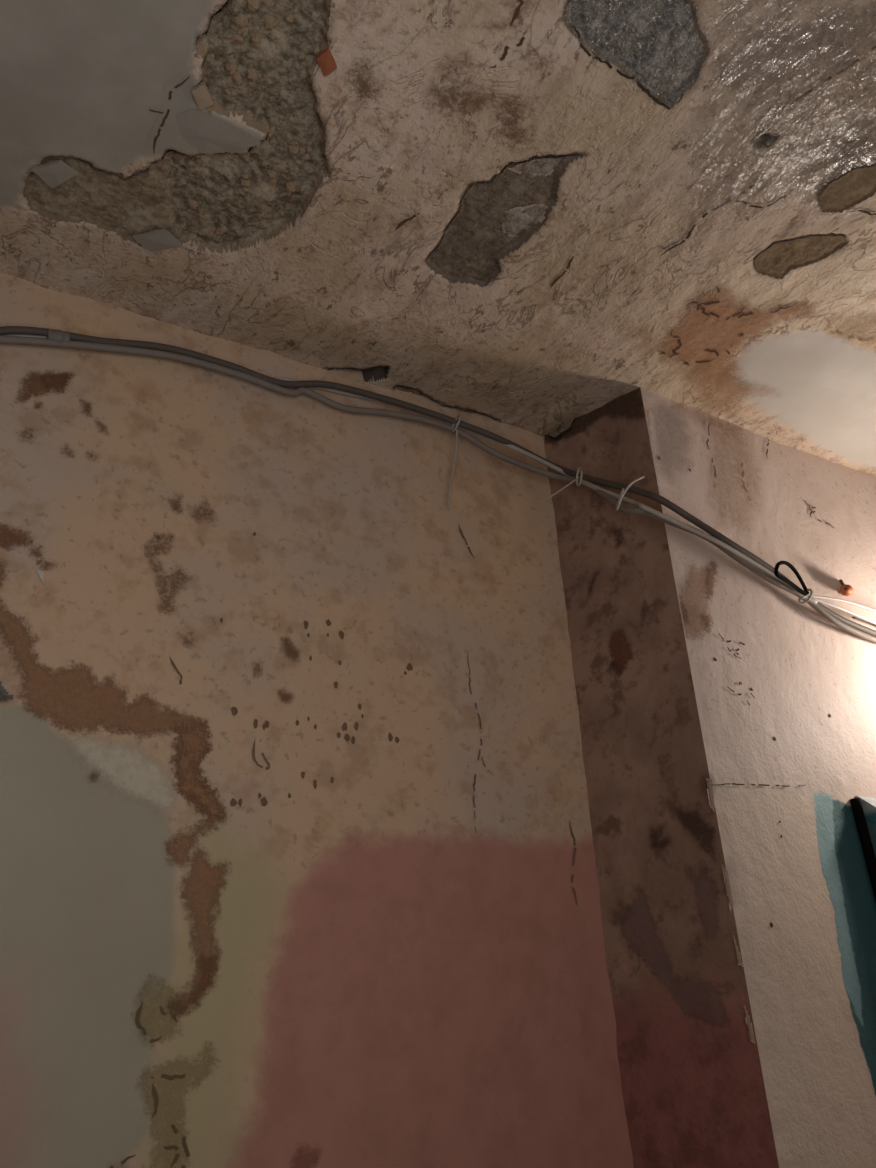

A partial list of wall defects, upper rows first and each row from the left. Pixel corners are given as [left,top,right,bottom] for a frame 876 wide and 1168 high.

flaking render [23,0,337,253]
flaking render [564,0,711,109]
leakage [692,0,876,220]
flaking render [426,154,587,287]
flaking render [752,235,849,279]
flaking render [817,165,876,213]
flaking render [0,681,13,701]
peeling [138,1047,212,1168]